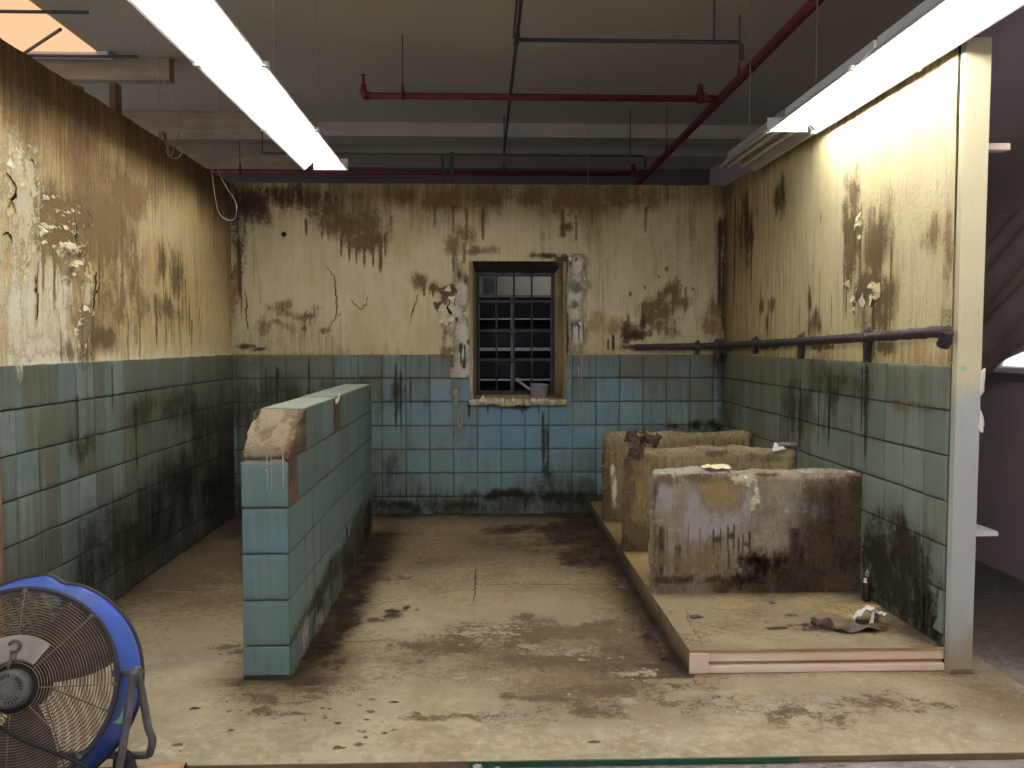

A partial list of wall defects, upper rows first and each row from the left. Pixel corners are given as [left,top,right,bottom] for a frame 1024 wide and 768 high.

crack [2,173,17,245]
flaking render [0,126,95,353]
crack [324,266,368,333]
water stain [304,198,392,271]
flaking render [433,258,470,378]
water stain [445,227,497,283]
flaking render [567,253,591,354]
water stain [607,267,694,351]
water stain [799,162,899,460]
flaking render [844,271,881,313]
spalling [242,408,307,504]
water stain [299,405,943,652]